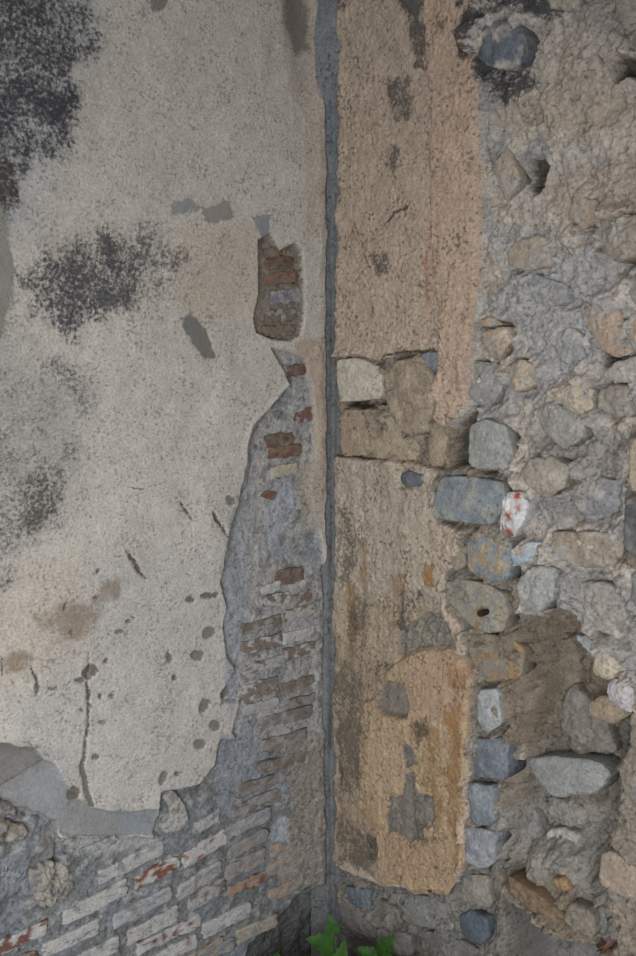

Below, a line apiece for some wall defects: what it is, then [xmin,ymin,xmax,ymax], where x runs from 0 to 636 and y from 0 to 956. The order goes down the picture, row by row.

damp [0,0,103,213]
damp [385,0,427,122]
damp [453,0,557,106]
damp [16,221,187,344]
damp [171,199,232,222]
damp [252,215,271,236]
spalling [333,0,636,956]
flaking render [0,233,327,956]
crack [79,653,94,807]